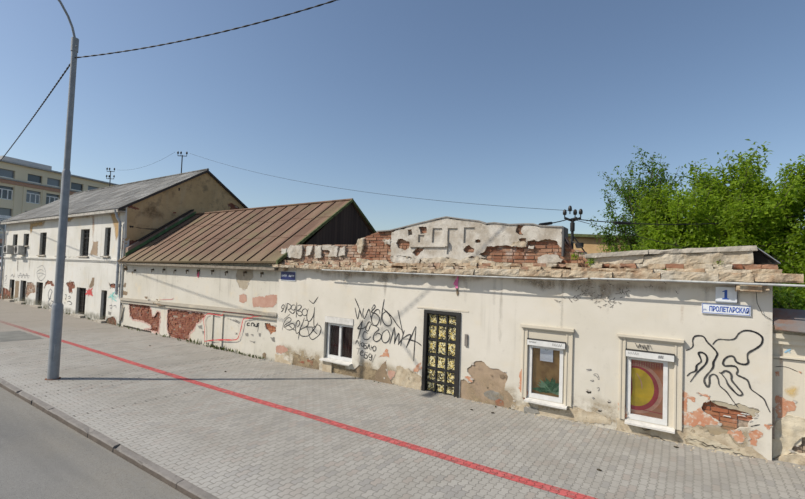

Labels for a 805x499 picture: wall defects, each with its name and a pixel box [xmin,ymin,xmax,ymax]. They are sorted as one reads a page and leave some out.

flaking render [2,280,54,300]
peeling [236,269,277,308]
flaking render [106,282,205,341]
flaking render [333,349,396,384]
flaking render [460,361,805,466]